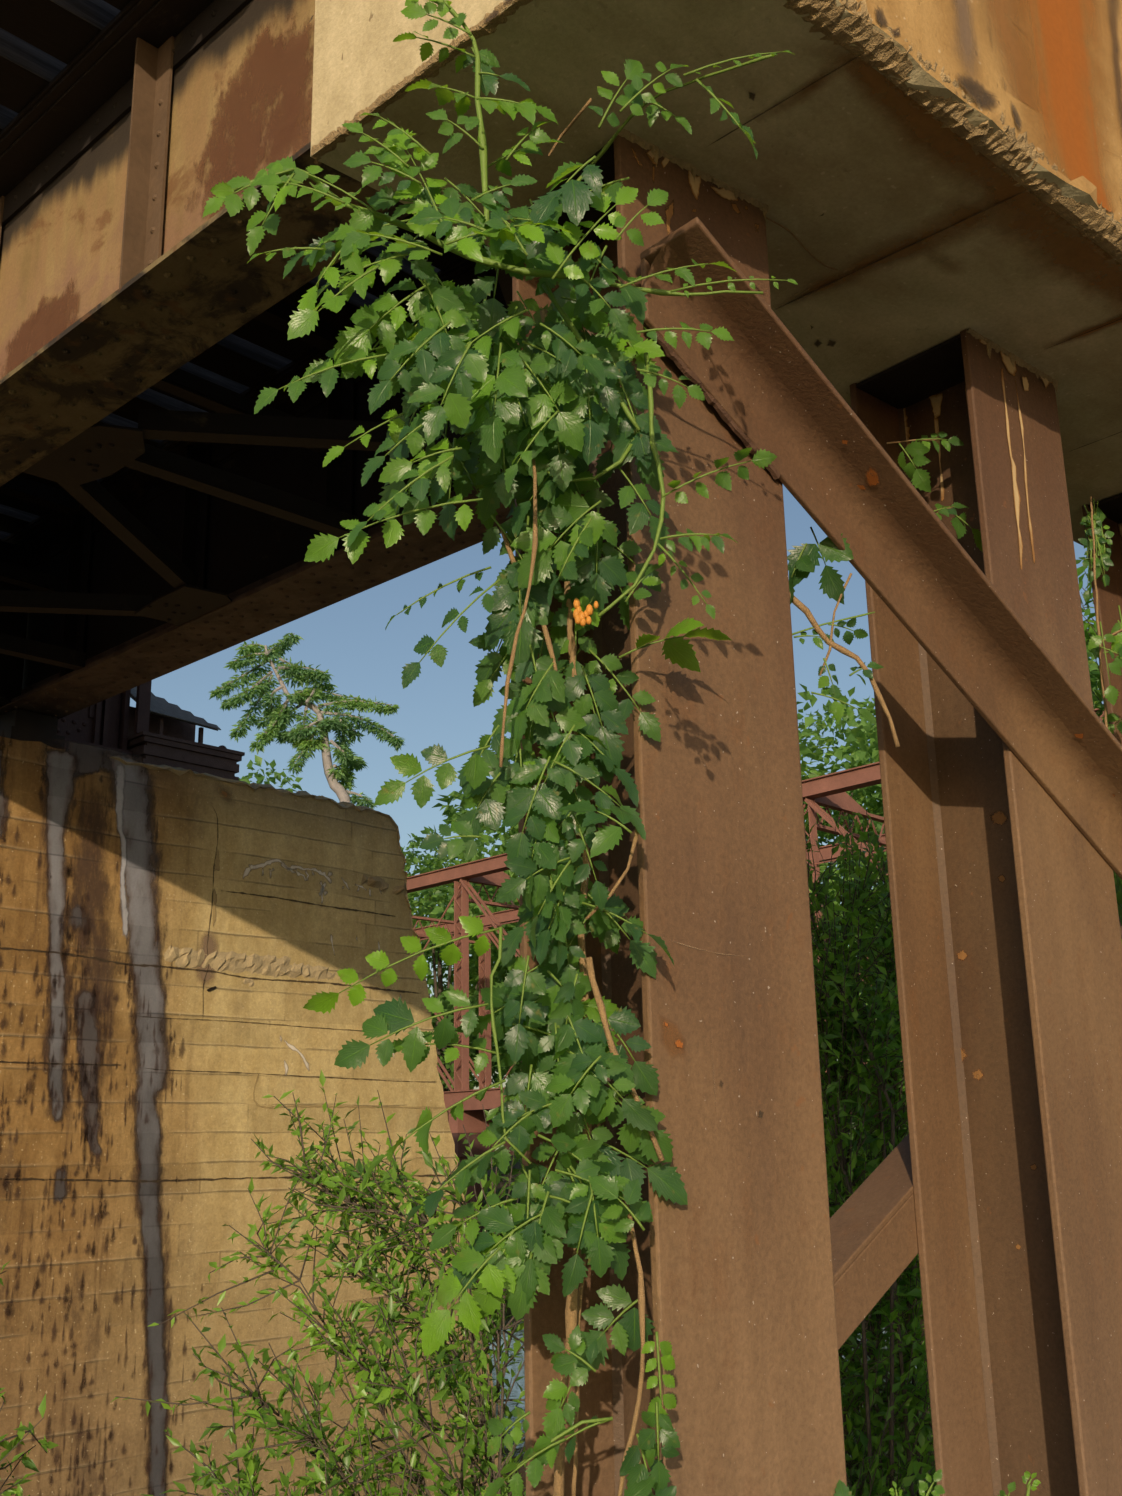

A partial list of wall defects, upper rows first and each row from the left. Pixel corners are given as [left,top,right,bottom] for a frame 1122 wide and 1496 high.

spalling [783,0,1122,264]
leakage [955,0,1021,128]
corrosion [986,0,1112,212]
corrosion [1,279,79,379]